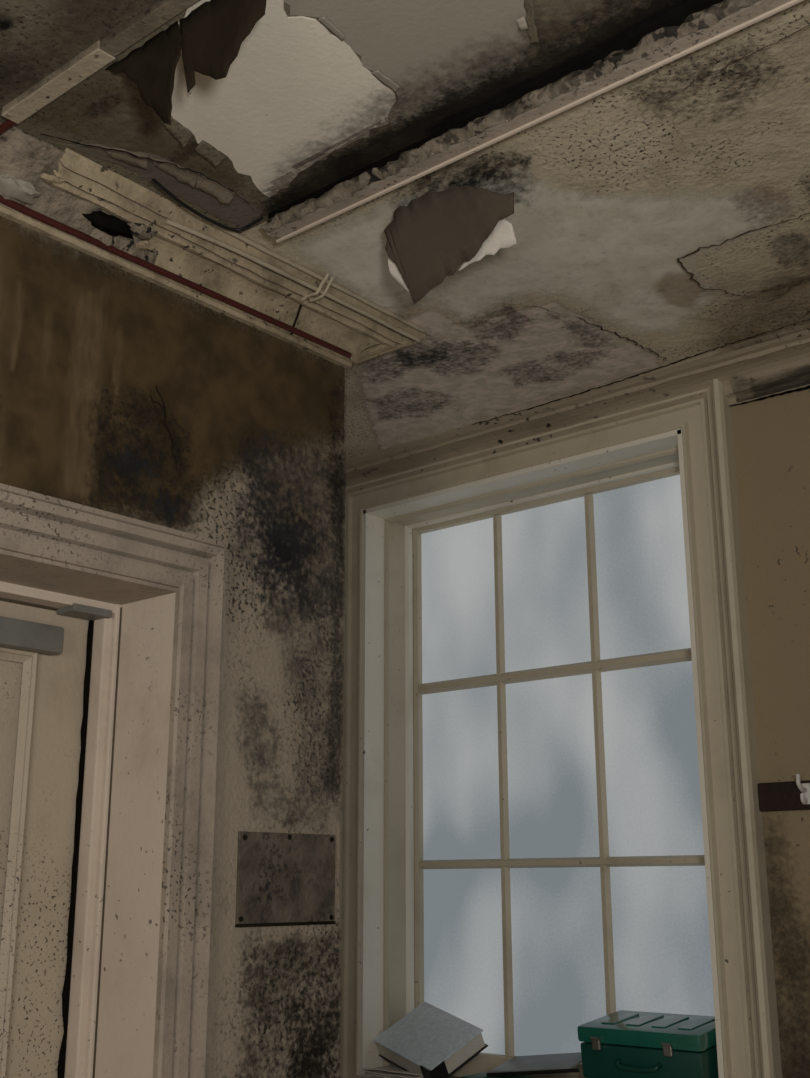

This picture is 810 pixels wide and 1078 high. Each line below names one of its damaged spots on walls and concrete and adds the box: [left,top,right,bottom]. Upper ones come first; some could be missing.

peeling [68,0,760,233]
damp [266,0,709,211]
damp [638,46,778,121]
spalling [82,211,156,250]
peeling [294,170,793,332]
damp [736,365,810,403]
damp [0,216,659,825]
damp [240,930,341,1078]